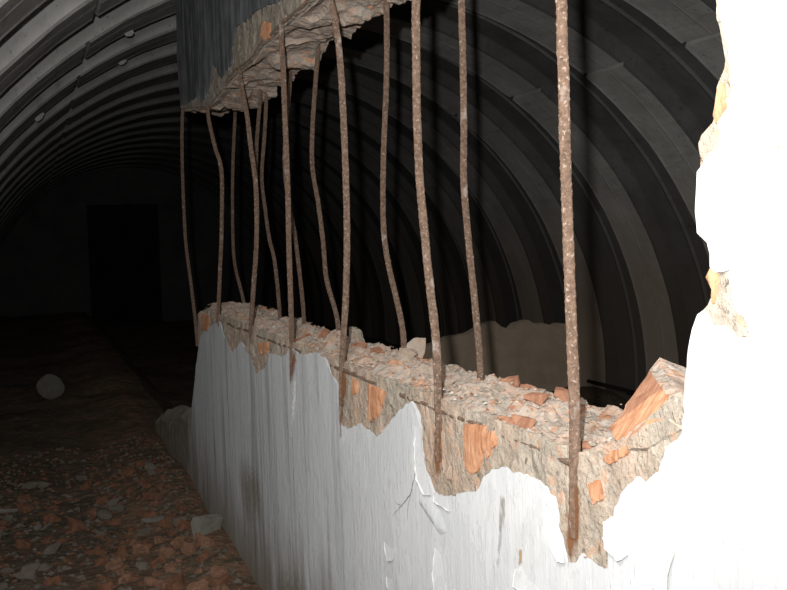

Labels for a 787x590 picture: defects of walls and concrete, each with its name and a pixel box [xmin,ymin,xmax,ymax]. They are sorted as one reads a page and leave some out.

spalling [698,0,732,167]
spalling [180,0,687,569]
spalling [704,268,749,337]
corrosion [567,487,578,555]